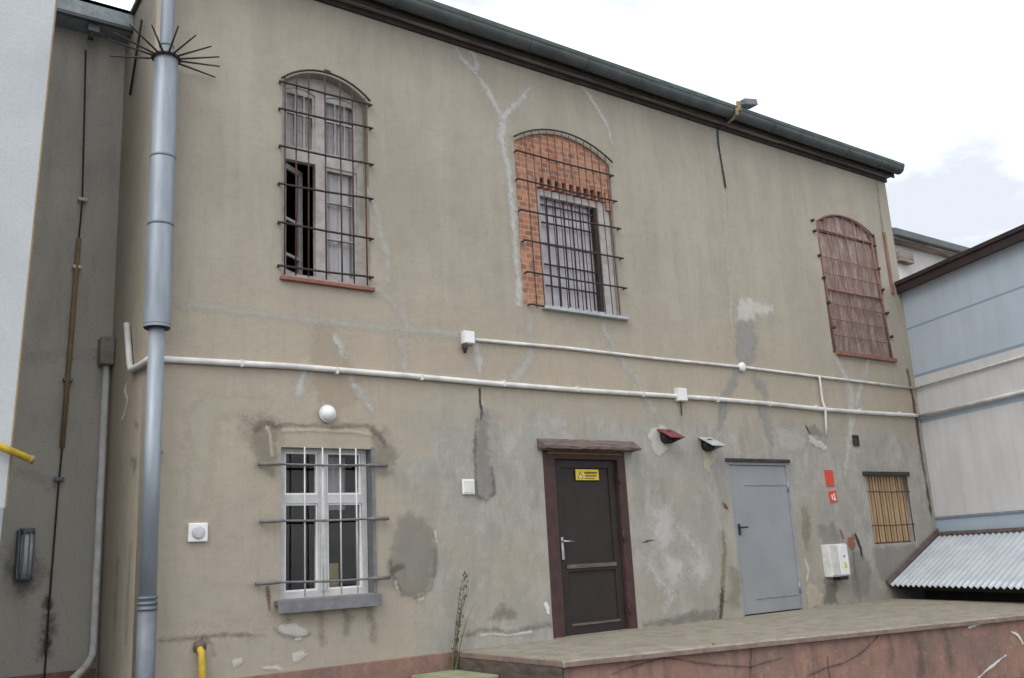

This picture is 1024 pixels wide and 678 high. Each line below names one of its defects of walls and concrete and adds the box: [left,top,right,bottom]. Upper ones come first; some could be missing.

crack [581,86,613,144]
crack [454,46,530,306]
flaking render [279,623,309,662]